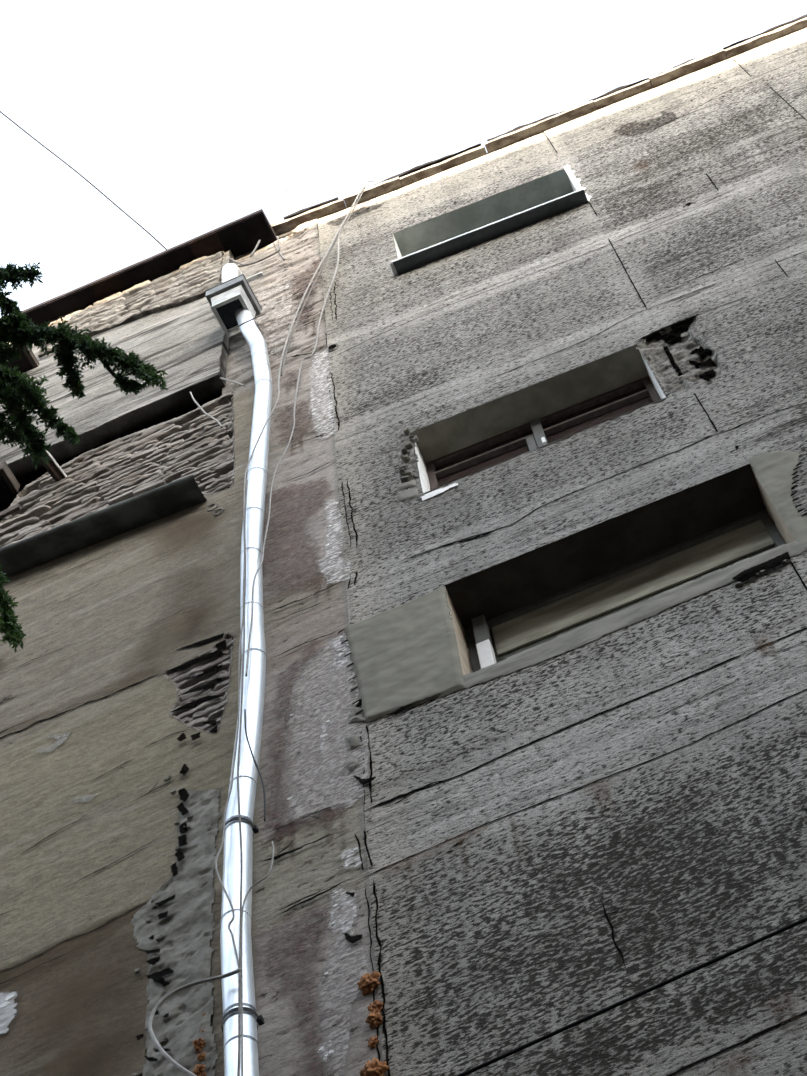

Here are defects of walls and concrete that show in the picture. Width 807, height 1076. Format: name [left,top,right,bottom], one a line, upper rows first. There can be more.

spalling [636,314,722,394]
spalling [395,429,458,501]
water stain [262,480,330,596]
spalling [164,632,237,742]
peeling [276,629,376,828]
spalling [164,764,193,877]
peeling [340,847,361,869]
spalling [134,895,175,987]
peeling [317,888,368,1076]
crack [599,897,628,973]
spalling [145,1038,170,1062]